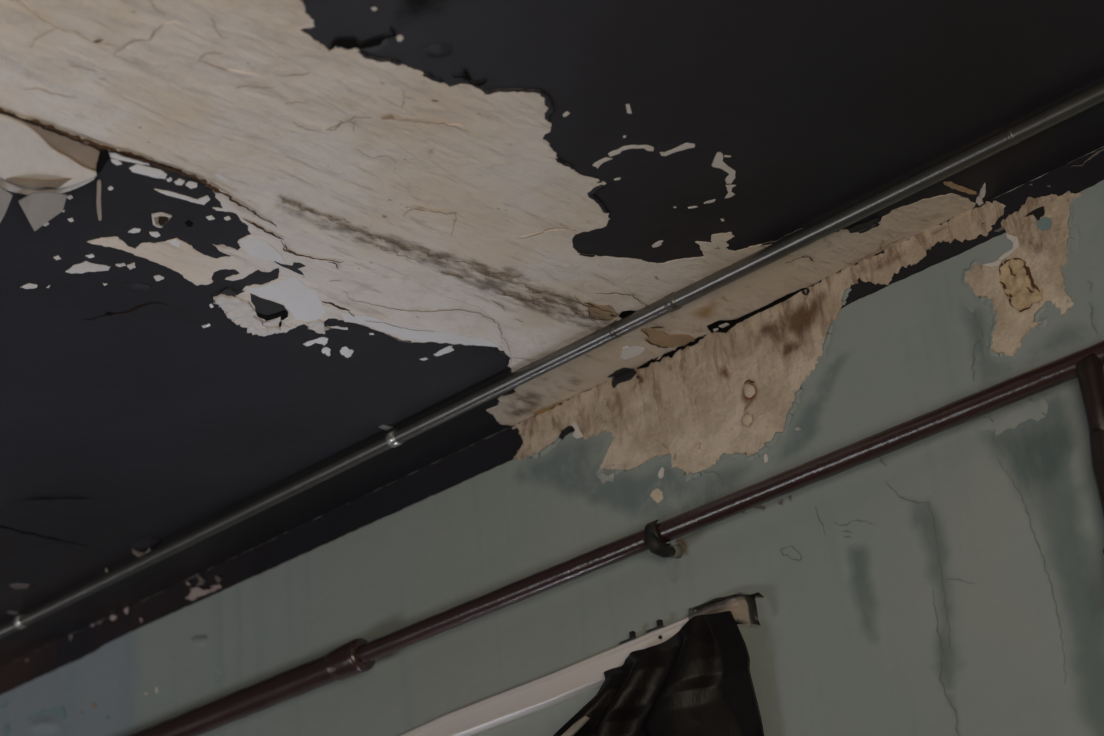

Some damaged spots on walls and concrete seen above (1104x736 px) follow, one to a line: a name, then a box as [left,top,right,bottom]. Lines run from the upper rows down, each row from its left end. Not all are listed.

peeling [0,0,804,372]
peeling [486,184,1082,504]
peeling [185,568,222,601]
crack [880,458,970,736]
crack [968,415,1067,681]